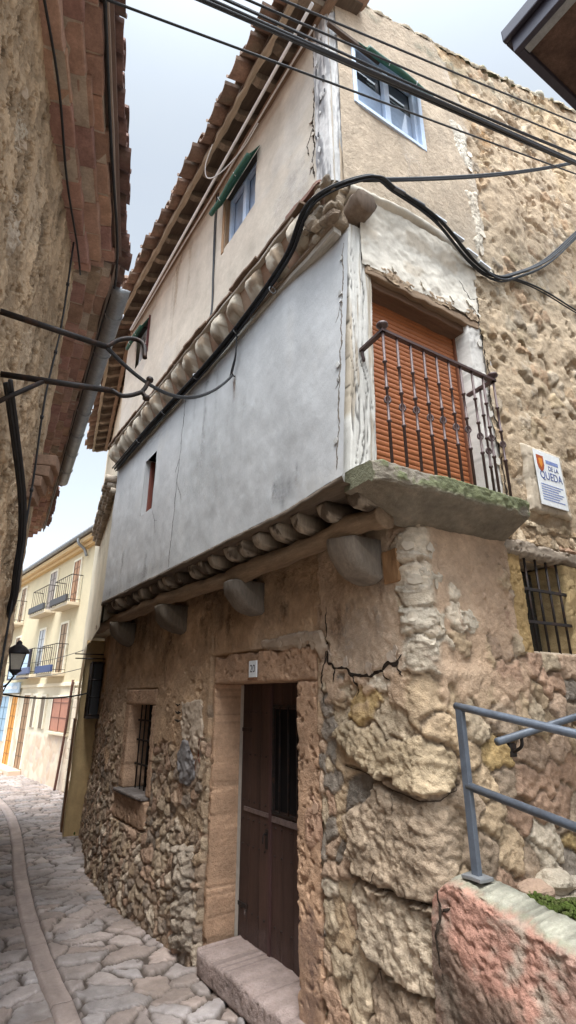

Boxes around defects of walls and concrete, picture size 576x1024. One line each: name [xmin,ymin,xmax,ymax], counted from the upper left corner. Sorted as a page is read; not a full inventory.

flaking render [465,190,486,256]
flaking render [367,265,479,322]
crack [321,611,402,702]